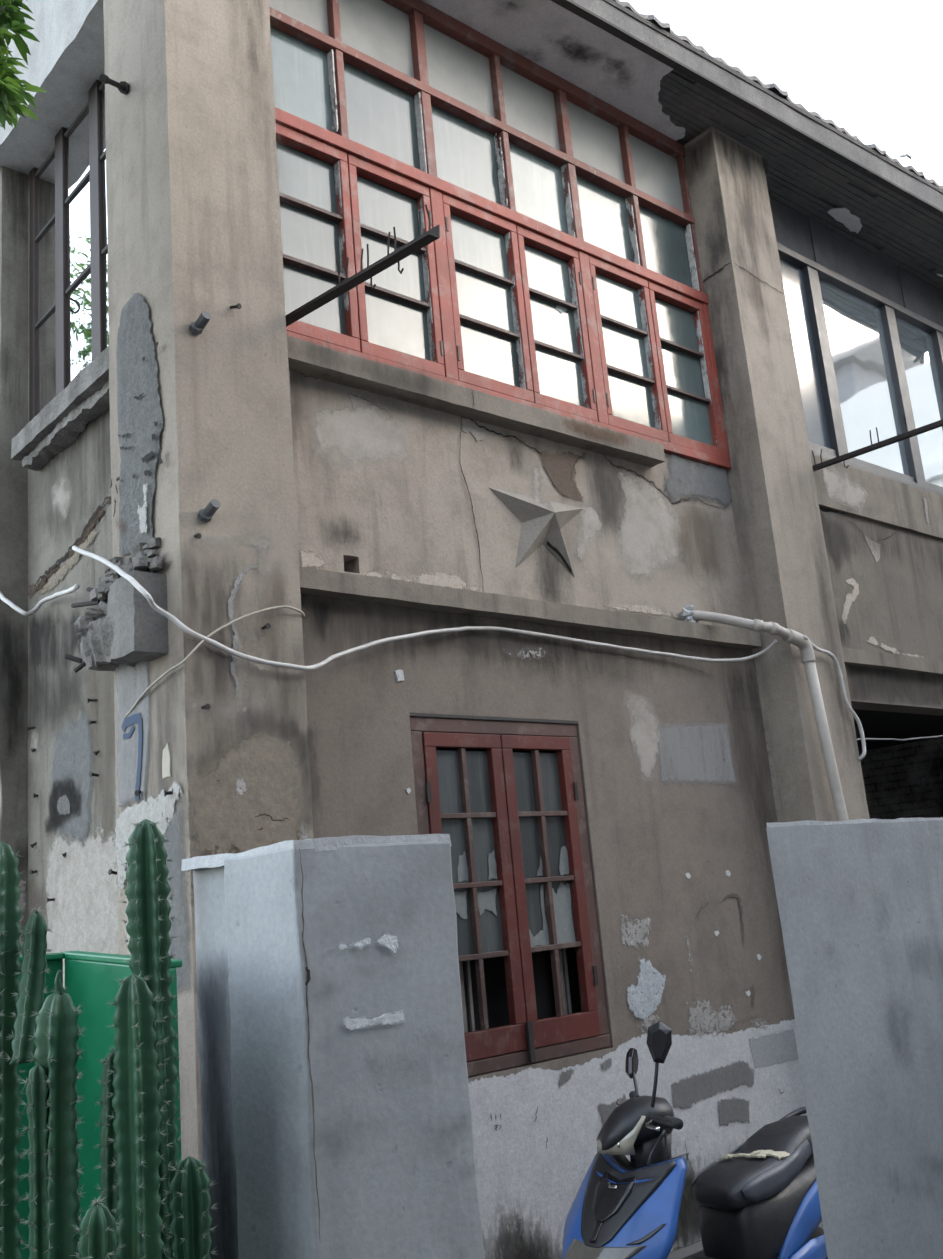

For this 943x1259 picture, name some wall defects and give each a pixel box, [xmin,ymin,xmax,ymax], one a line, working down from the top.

water stain [565,44,593,60]
crack [460,390,553,580]
crack [600,453,720,508]
peeling [37,529,98,594]
flaking render [841,578,860,624]
peeling [46,742,182,988]
peeling [18,879,27,955]
peeling [627,958,666,1033]
peeling [688,1000,735,1036]
water stain [497,1216,559,1259]
water stain [675,1173,700,1247]